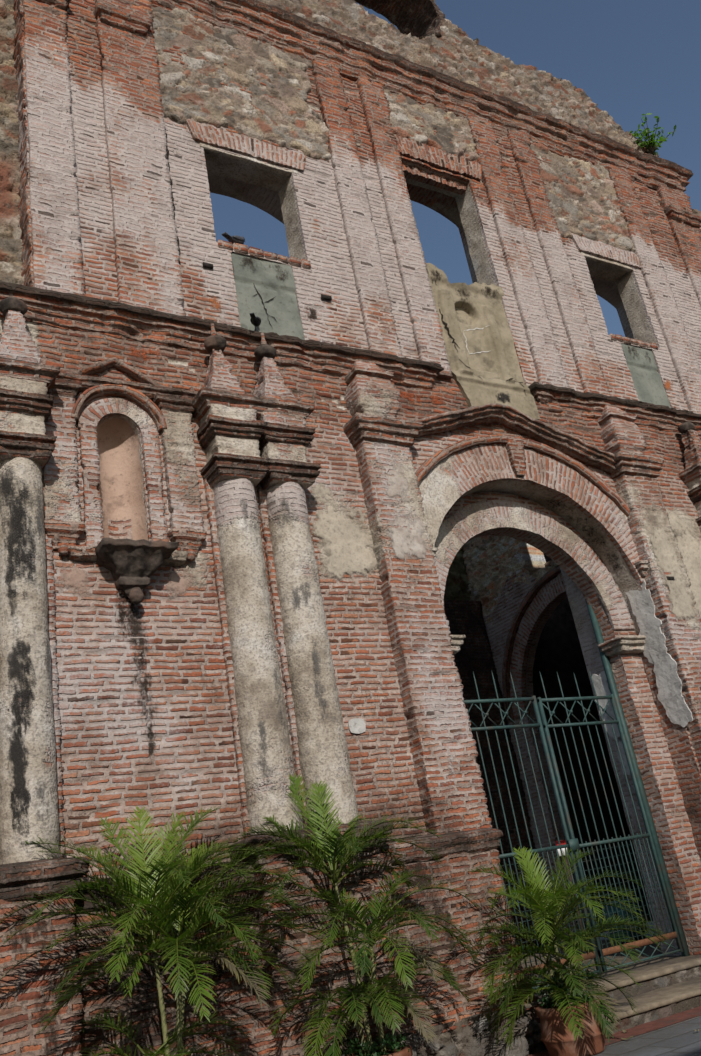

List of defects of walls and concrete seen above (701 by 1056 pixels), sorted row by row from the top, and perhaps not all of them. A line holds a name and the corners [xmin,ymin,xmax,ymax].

crack [439,309,525,391]
water stain [0,466,43,615]
flaking render [311,483,377,579]
flaking render [388,515,426,559]
flaking render [649,508,701,626]
water stain [7,637,51,845]
water stain [117,593,156,754]
flaking render [626,580,693,728]